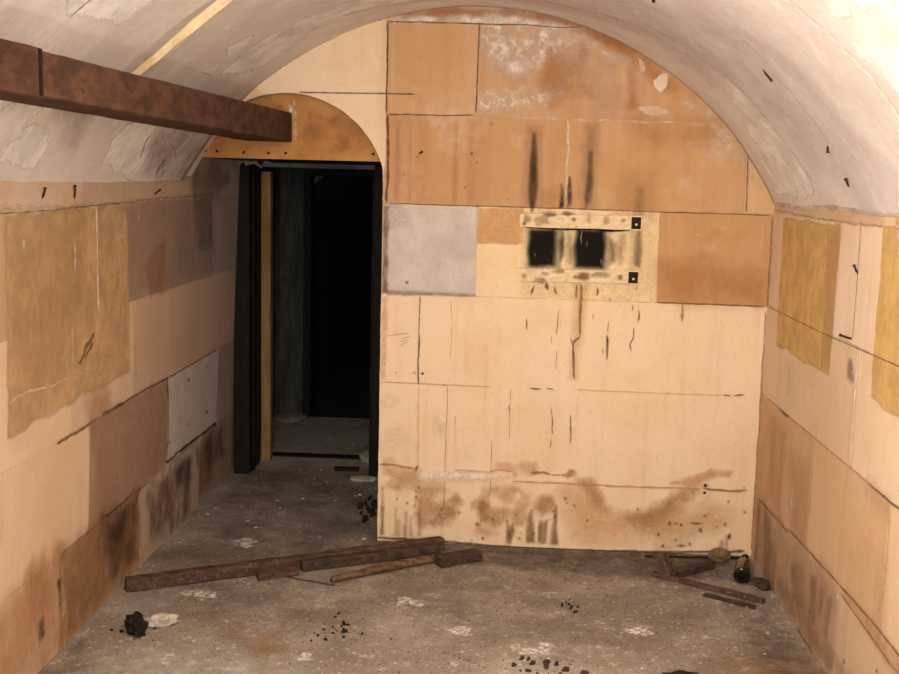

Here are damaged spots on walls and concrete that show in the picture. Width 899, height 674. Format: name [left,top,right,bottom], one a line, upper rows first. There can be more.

damp [408,13,588,109]
peeling [852,40,899,93]
crack [289,21,899,553]
damp [63,446,193,630]
damp [393,471,498,525]
damp [538,497,553,512]
damp [565,472,730,547]